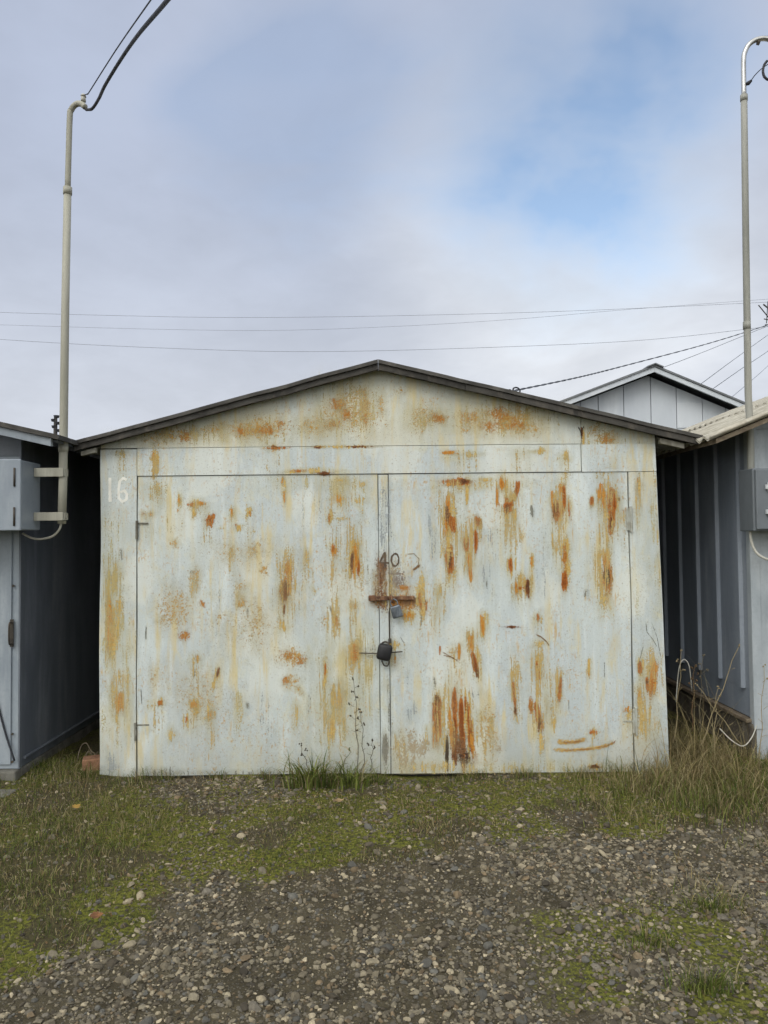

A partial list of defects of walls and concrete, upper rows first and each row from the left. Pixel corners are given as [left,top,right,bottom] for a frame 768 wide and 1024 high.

rust [102,518,129,743]
rust [167,444,546,748]
rust [379,611,524,774]
rust [551,449,572,592]
rust [510,641,616,773]
rust [590,470,659,616]
rust [625,646,663,739]